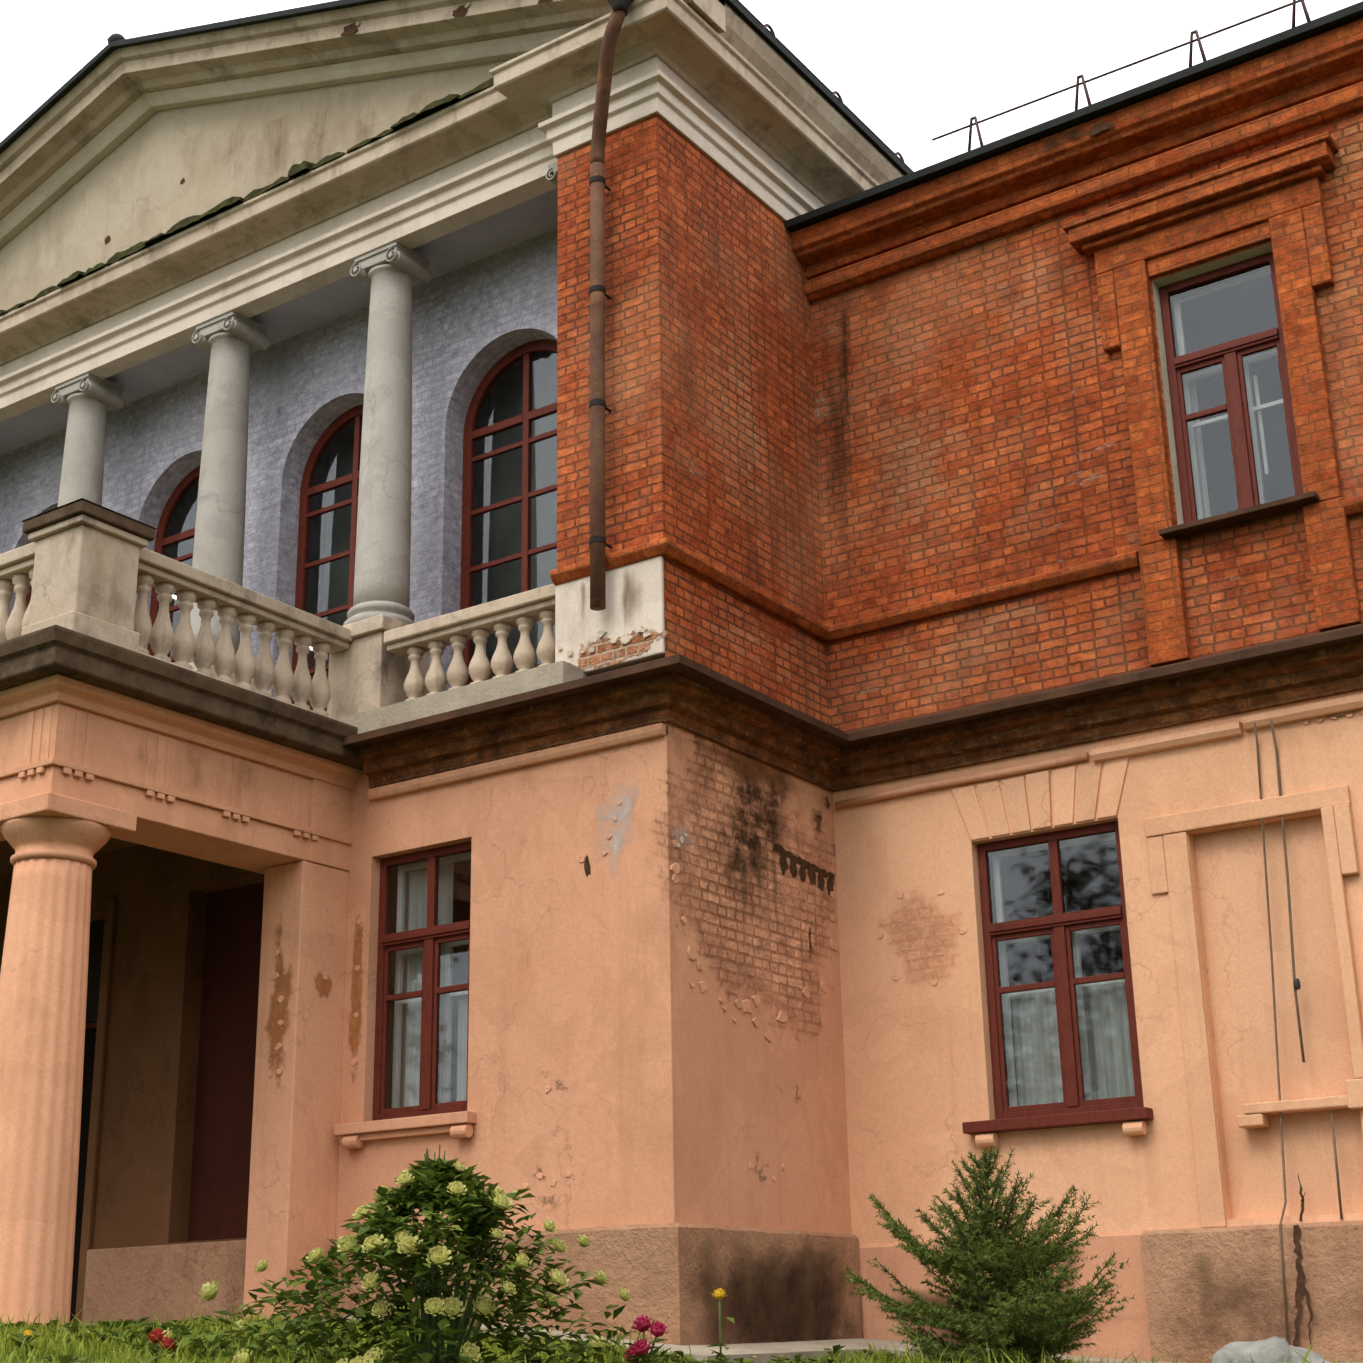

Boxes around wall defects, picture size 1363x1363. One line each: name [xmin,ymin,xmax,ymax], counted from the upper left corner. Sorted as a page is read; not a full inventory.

flaking render [558,626,667,671]
peeling [578,797,631,877]
flaking render [654,735,839,1042]
peeling [267,926,290,1078]
peeling [315,973,331,996]
peeling [349,919,362,1066]